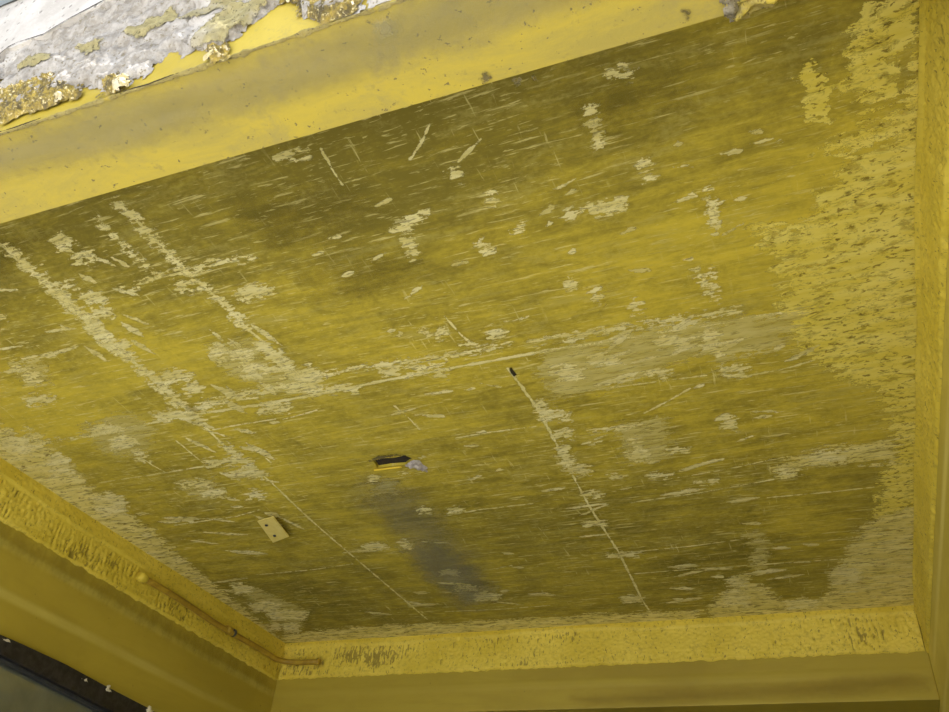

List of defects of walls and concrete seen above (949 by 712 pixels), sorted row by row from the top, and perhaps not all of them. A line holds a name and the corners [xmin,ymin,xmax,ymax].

flaking render [0,0,407,136]
peeling [0,230,155,408]
peeling [173,279,194,296]
peeling [79,282,361,464]
peeling [216,0,920,643]
peeling [0,426,267,621]
peeling [173,428,279,508]